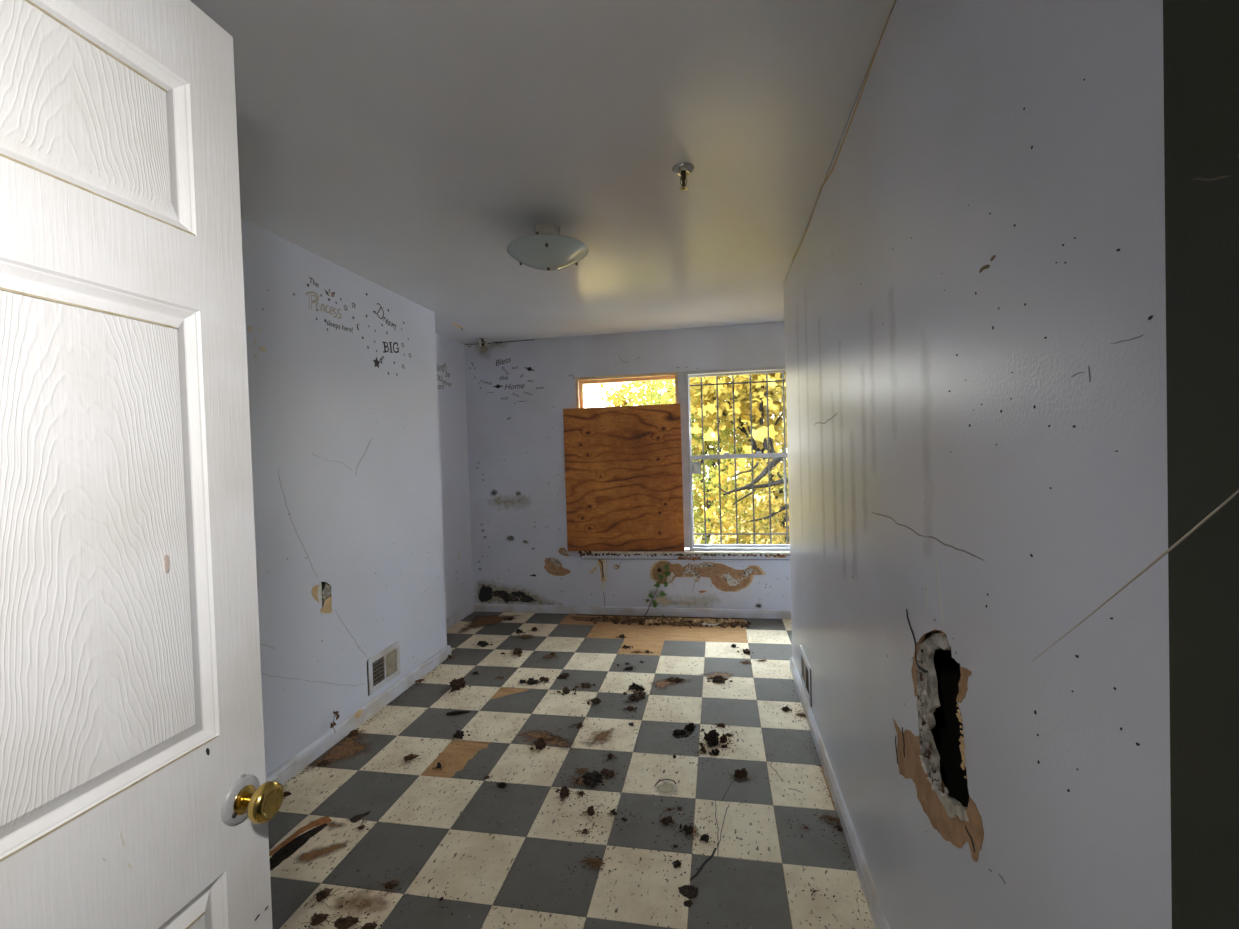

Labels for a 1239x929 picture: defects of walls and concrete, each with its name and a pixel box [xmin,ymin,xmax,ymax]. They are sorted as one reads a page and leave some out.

leakage [461,524,539,632]
peeling [530,547,571,577]
peeling [650,560,766,593]
spalling [311,582,334,615]
spalling [893,629,984,862]